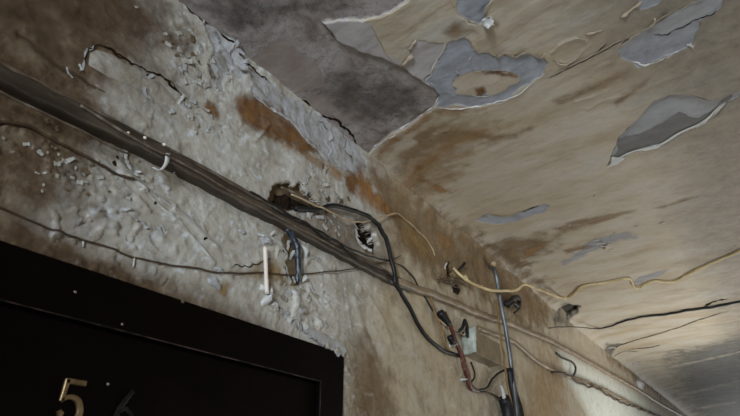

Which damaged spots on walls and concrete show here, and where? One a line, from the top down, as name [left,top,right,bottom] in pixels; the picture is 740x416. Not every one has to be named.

peeling [617,0,723,67]
peeling [22,142,104,196]
crack [80,44,185,104]
corrosion [205,102,218,117]
corrosion [236,96,392,216]
flaking render [161,0,551,237]
flaking render [608,92,740,167]
spalling [354,223,374,252]
damp [371,169,549,328]
peeling [258,231,346,357]
crack [609,299,728,358]
damp [607,340,740,416]